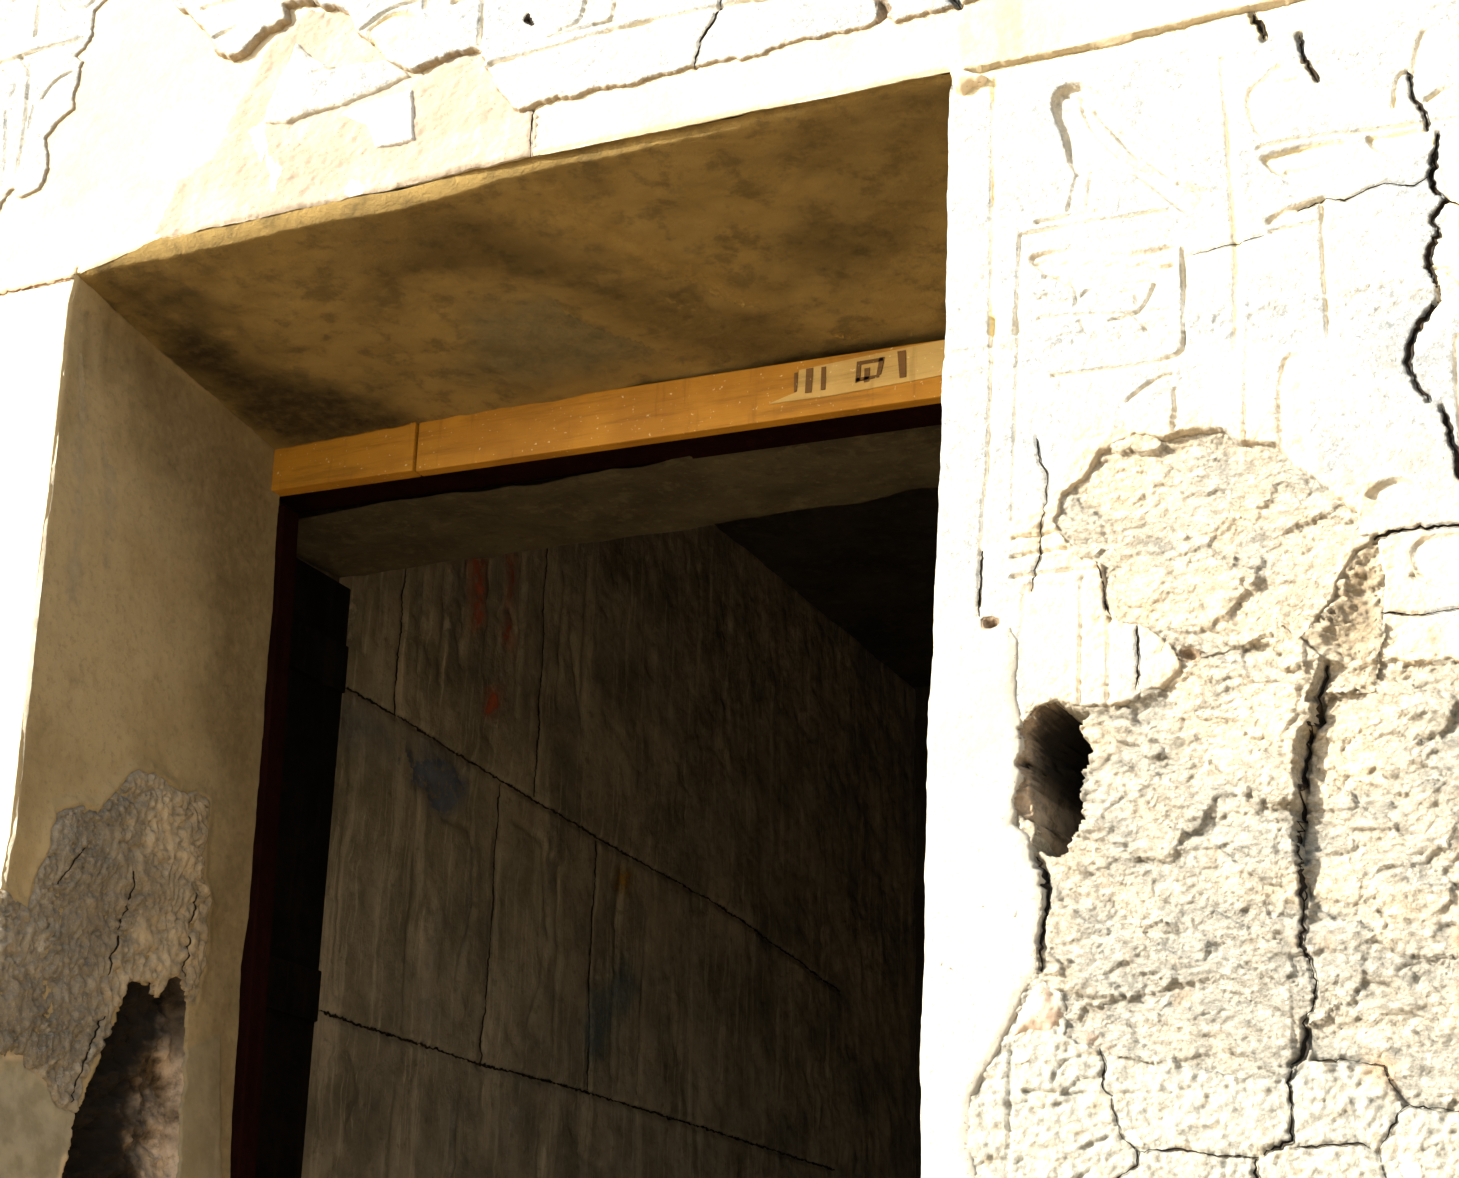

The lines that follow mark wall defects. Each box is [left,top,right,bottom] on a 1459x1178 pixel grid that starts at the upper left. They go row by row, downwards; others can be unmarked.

crack [694,0,722,68]
crack [1252,14,1318,82]
crack [1193,235,1264,255]
crack [1298,71,1459,479]
crack [1374,524,1459,541]
crack [1381,608,1459,616]
spalling [1014,432,1459,1114]
crack [1036,857,1051,972]
crack [1099,665,1459,1178]
spalling [62,976,186,1178]
peeling [1125,1130,1145,1149]